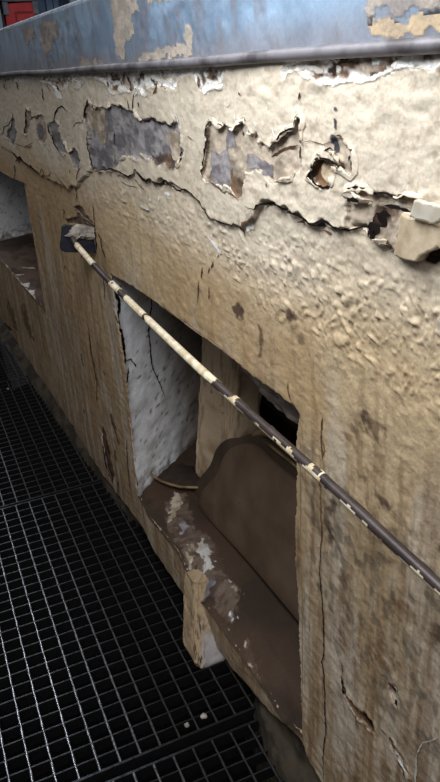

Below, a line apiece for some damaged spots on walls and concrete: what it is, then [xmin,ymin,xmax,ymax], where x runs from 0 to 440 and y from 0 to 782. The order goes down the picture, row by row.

peeling [111,0,169,60]
peeling [138,24,194,61]
flaking render [281,54,440,82]
flaking render [2,56,224,172]
flaking render [199,104,440,253]
crack [10,143,368,301]
flaking render [426,249,440,264]
crack [103,278,164,393]
crack [80,336,106,411]
crack [318,415,326,458]
flaking render [185,538,216,601]
crack [318,482,326,779]